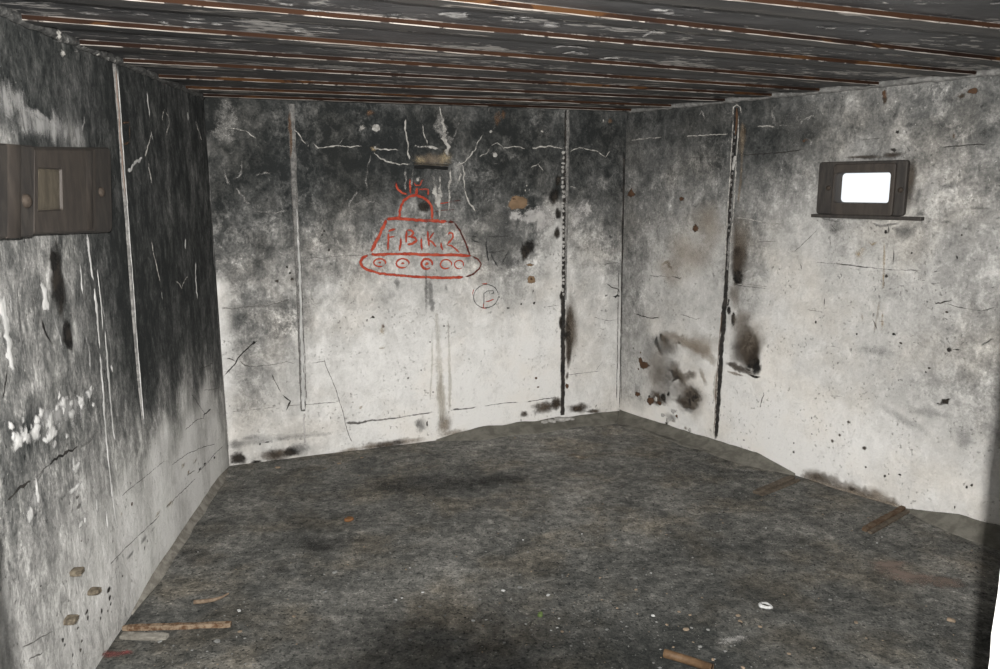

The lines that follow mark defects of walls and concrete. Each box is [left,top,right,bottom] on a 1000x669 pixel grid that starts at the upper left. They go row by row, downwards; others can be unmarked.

peeling [8,385,95,451]
leakage [40,236,118,527]
crack [186,341,352,441]
leakage [564,311,575,389]
leakage [672,364,705,406]
leakage [728,327,761,378]
crack [7,440,91,501]
peeling [69,456,80,494]
leakage [804,474,895,506]